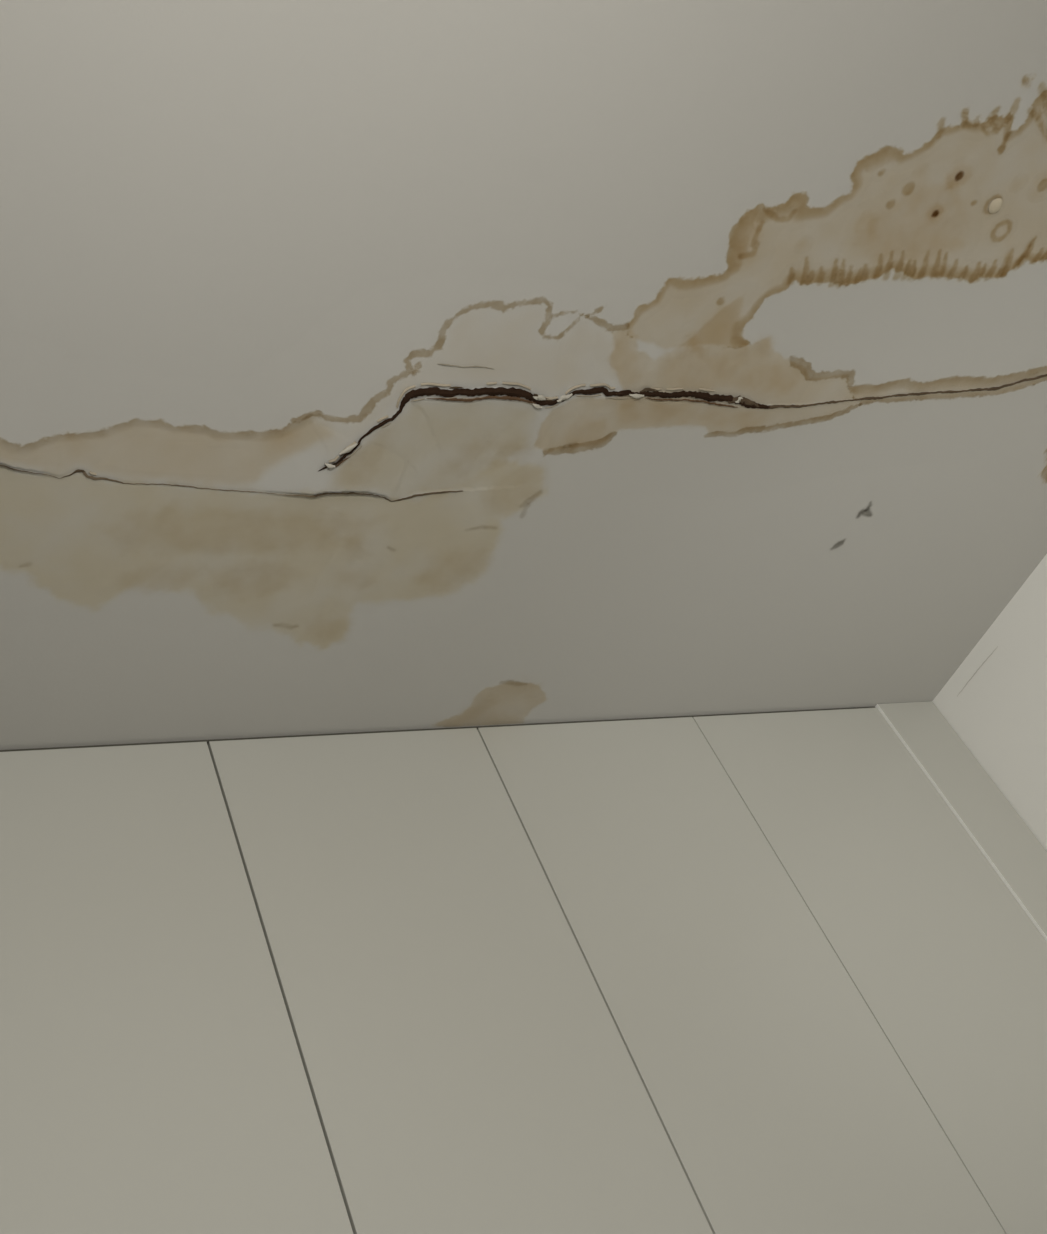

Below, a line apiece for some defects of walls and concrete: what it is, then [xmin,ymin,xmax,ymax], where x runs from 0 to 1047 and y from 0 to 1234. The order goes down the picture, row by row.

crack [0,363,1047,502]